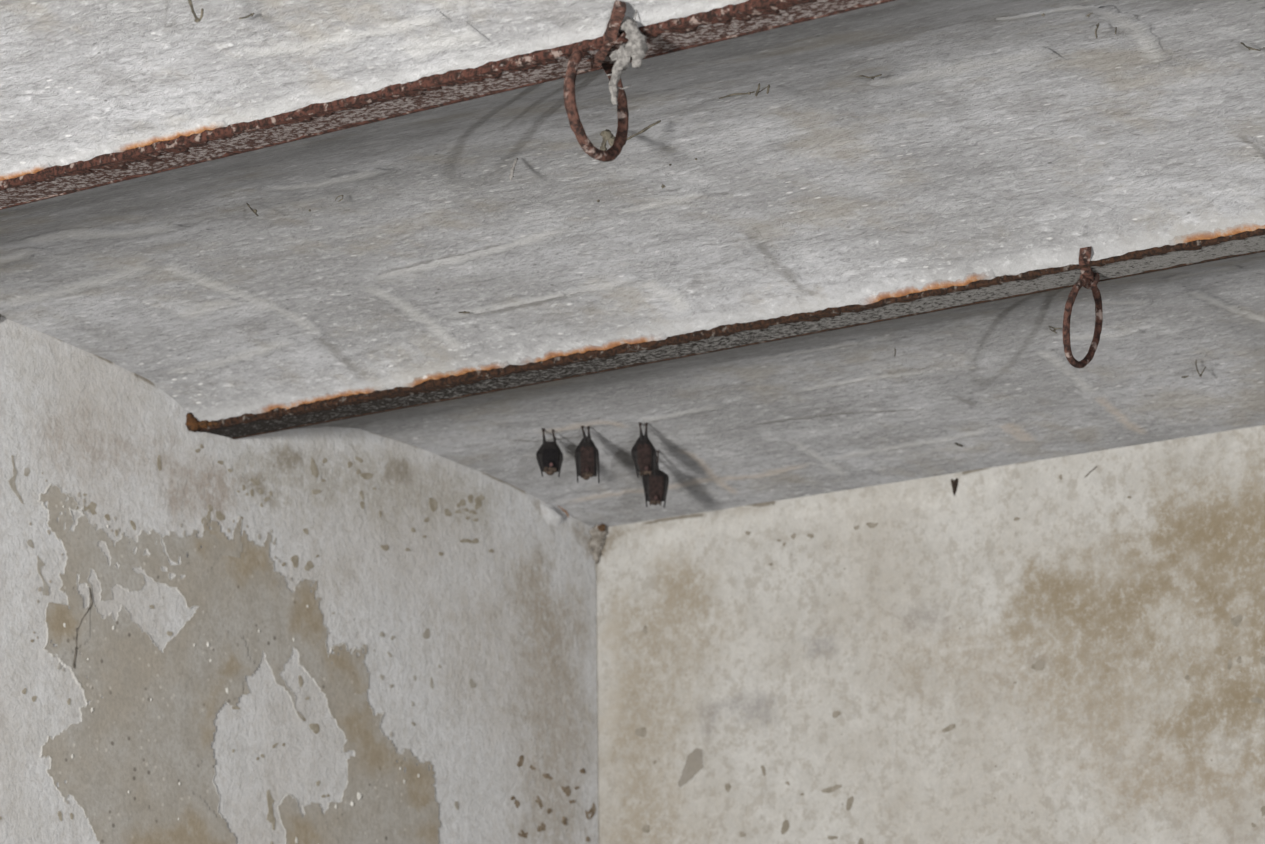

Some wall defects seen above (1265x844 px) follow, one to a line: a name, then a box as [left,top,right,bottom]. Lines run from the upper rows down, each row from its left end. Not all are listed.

corrosion [110,119,227,153]
corrosion [0,162,51,181]
corrosion [1168,222,1265,245]
corrosion [858,269,995,305]
corrosion [401,332,667,387]
corrosion [251,385,387,414]
peeling [411,494,485,538]
crack [73,589,93,668]
peeling [8,455,440,844]
damp [5,380,1265,844]